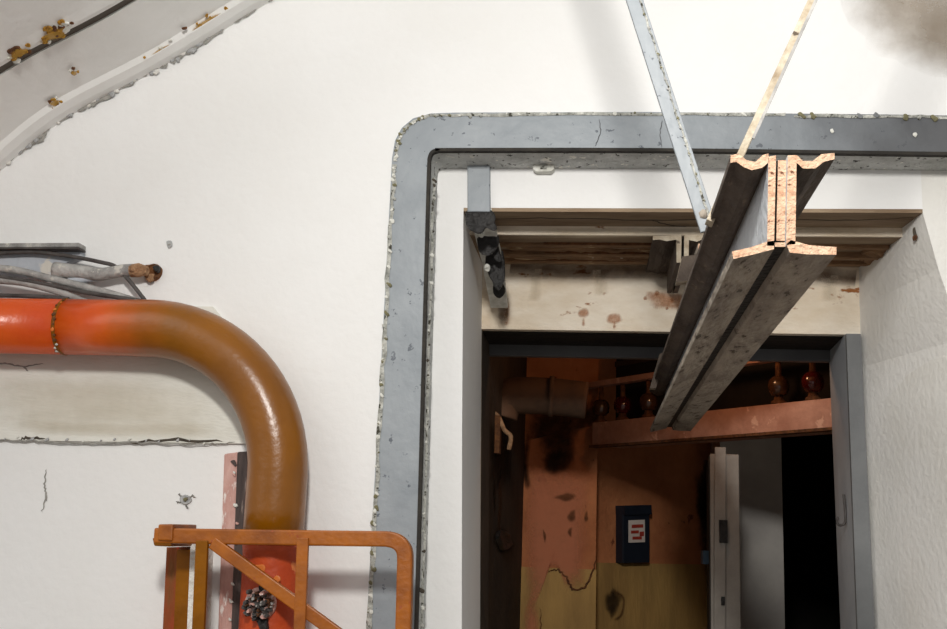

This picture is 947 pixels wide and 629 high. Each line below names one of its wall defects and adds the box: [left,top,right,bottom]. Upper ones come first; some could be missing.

rust [7,19,74,64]
rust [182,7,228,30]
leakage [882,0,947,52]
crack [0,436,231,446]